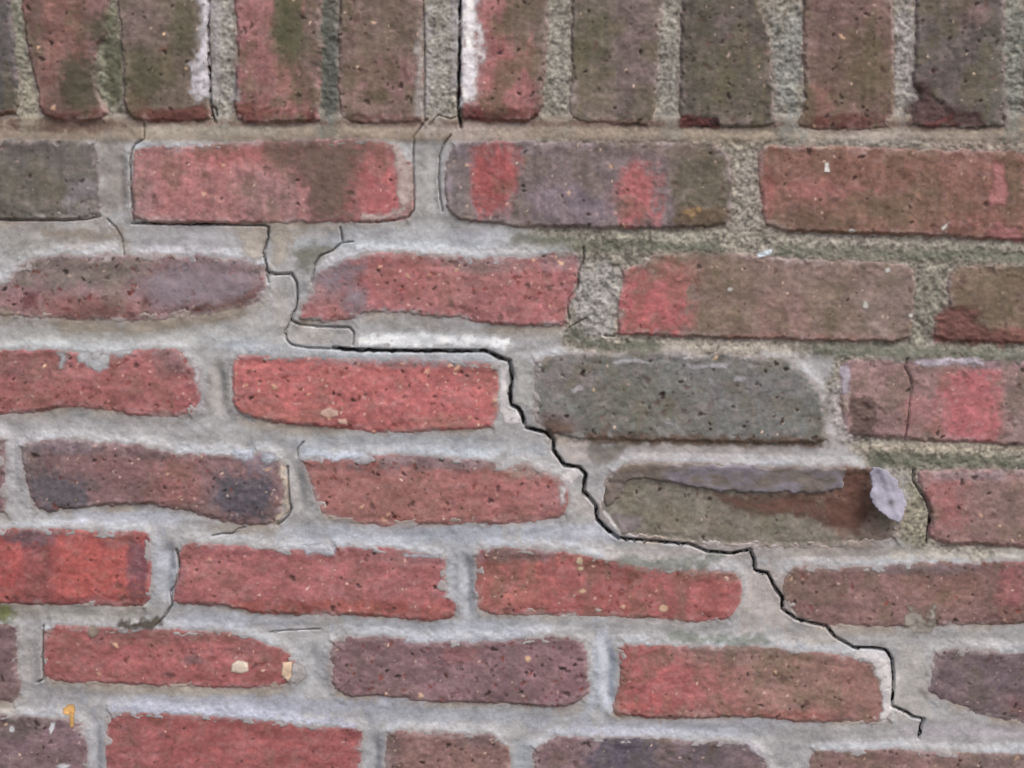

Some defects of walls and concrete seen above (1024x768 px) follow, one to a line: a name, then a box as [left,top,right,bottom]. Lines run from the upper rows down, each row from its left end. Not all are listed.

crack [375,0,462,223]
crack [1,130,922,737]
peeling [603,462,847,506]
peeling [869,467,907,523]
crack [912,470,931,542]